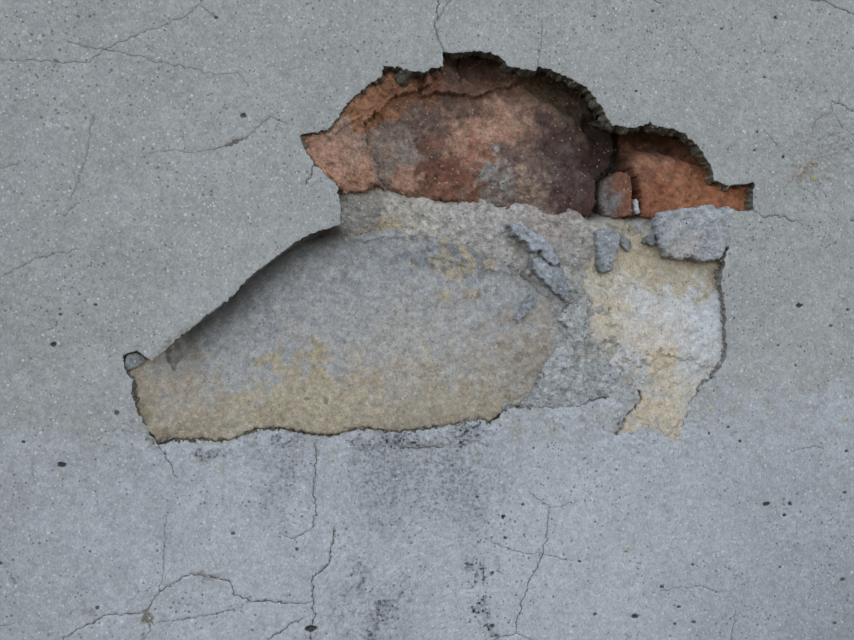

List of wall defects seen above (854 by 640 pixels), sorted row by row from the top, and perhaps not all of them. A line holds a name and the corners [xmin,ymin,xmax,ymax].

crack [0,0,248,84]
crack [434,0,451,50]
crack [156,116,286,153]
crack [0,249,78,278]
spalling [123,51,755,445]
crack [63,442,335,640]
crack [486,492,576,640]